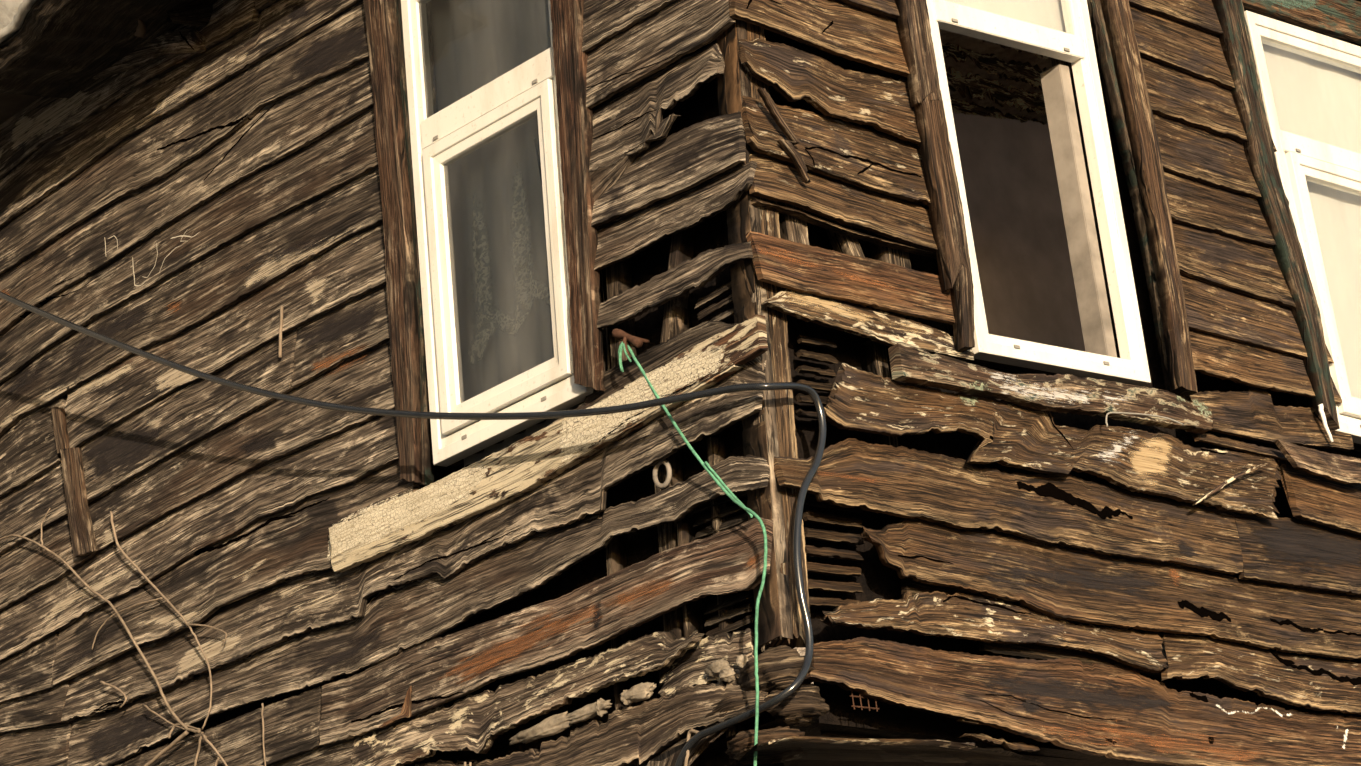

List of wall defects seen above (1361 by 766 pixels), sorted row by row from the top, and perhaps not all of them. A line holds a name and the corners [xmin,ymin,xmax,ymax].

crack [805,146,921,177]
crack [1017,481,1133,519]
crack [1177,600,1232,622]
corrosion [445,580,675,683]
crack [1270,618,1361,685]
crack [1189,692,1209,702]